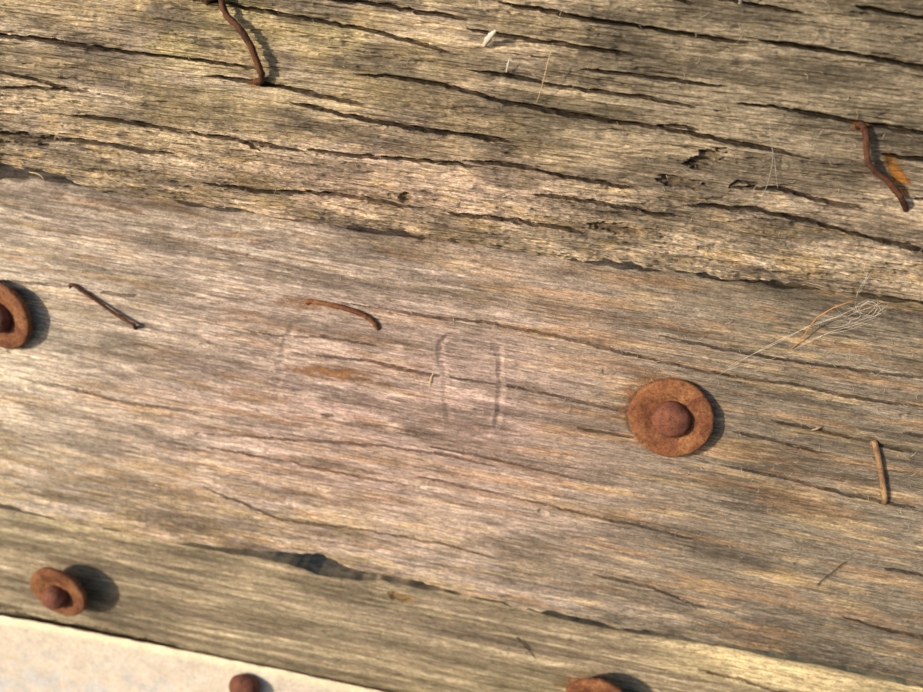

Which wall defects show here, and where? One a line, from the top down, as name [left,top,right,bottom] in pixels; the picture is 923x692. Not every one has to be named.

crack [193,0,923,162]
crack [0,33,923,253]
corrosion [885,157,910,195]
crack [0,279,69,288]
crack [19,377,698,541]
crack [721,464,916,509]
crack [203,486,496,560]
crack [592,574,706,608]
crack [884,567,923,577]
crack [0,603,176,647]
crack [841,616,923,639]
crack [697,668,787,692]